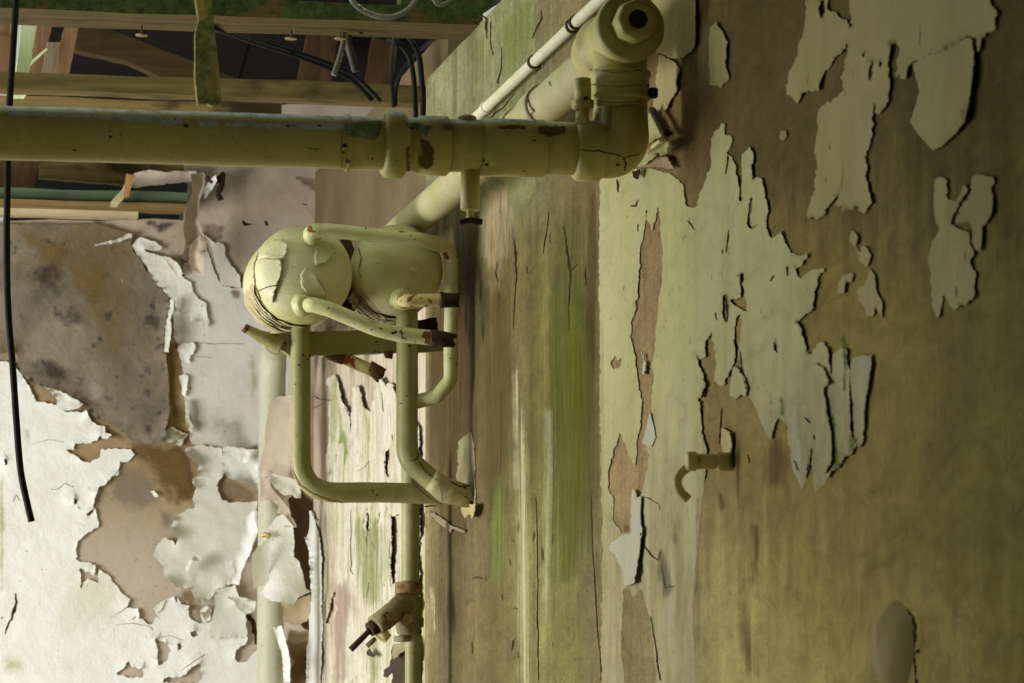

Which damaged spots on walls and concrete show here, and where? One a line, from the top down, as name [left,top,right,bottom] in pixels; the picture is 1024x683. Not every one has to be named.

crack [482,15,551,121]
peeling [786,0,998,219]
mould [44,363,64,378]
damp [482,189,512,262]
crack [482,181,586,330]
peeling [598,0,873,683]
peeling [837,230,883,318]
peeling [928,174,995,320]
peeling [0,231,411,683]
peeling [456,432,476,531]
crack [511,498,539,681]
crack [590,499,601,679]